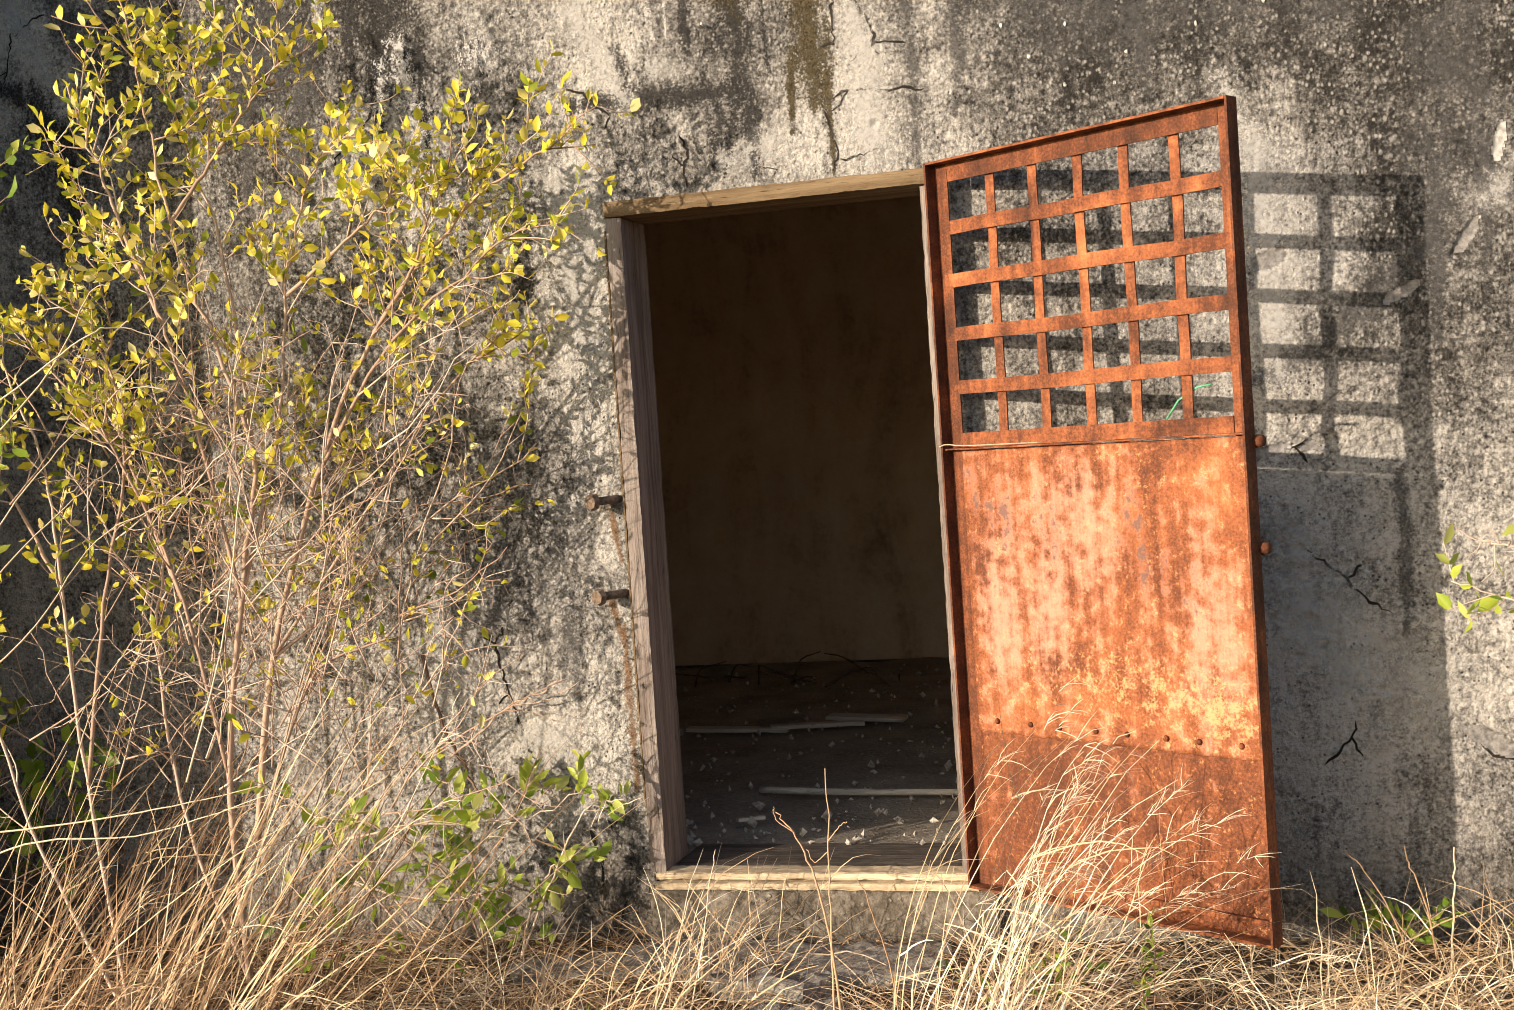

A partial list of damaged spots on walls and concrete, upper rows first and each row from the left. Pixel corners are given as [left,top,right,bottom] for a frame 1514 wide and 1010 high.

water stain [562,0,798,178]
water stain [818,64,837,177]
water stain [1253,0,1512,390]
corrosion [608,504,623,562]
crack [1307,550,1394,614]
crack [1325,720,1363,765]